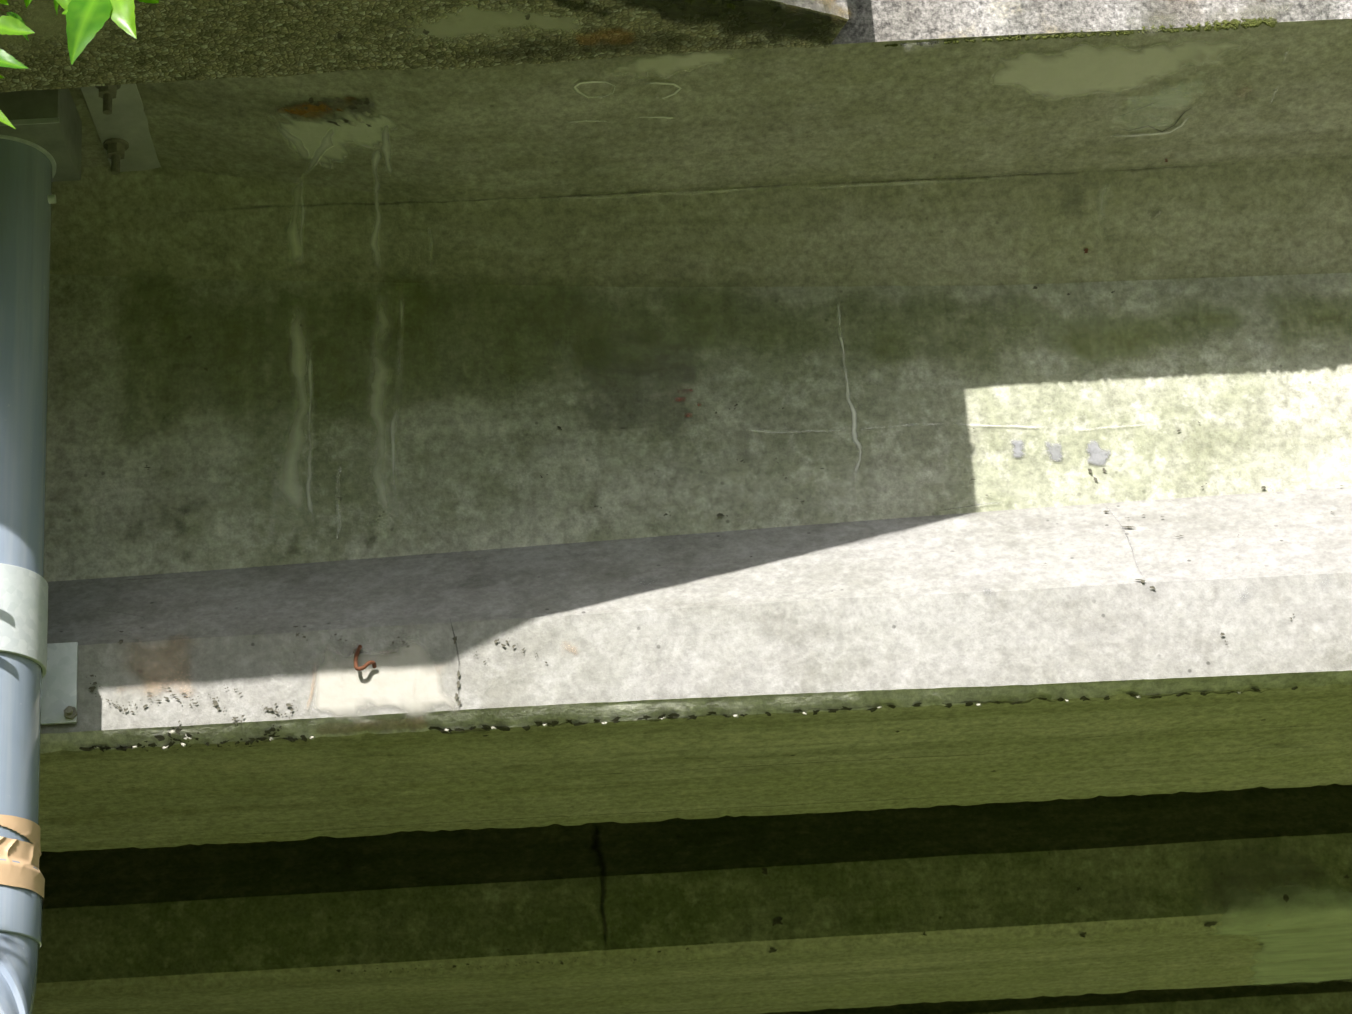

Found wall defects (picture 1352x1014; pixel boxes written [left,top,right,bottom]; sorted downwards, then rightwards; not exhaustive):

efflorescence [270,108,397,262]
efflorescence [282,318,311,510]
efflorescence [372,360,396,502]
crack [838,315,861,467]
crack [593,827,607,938]